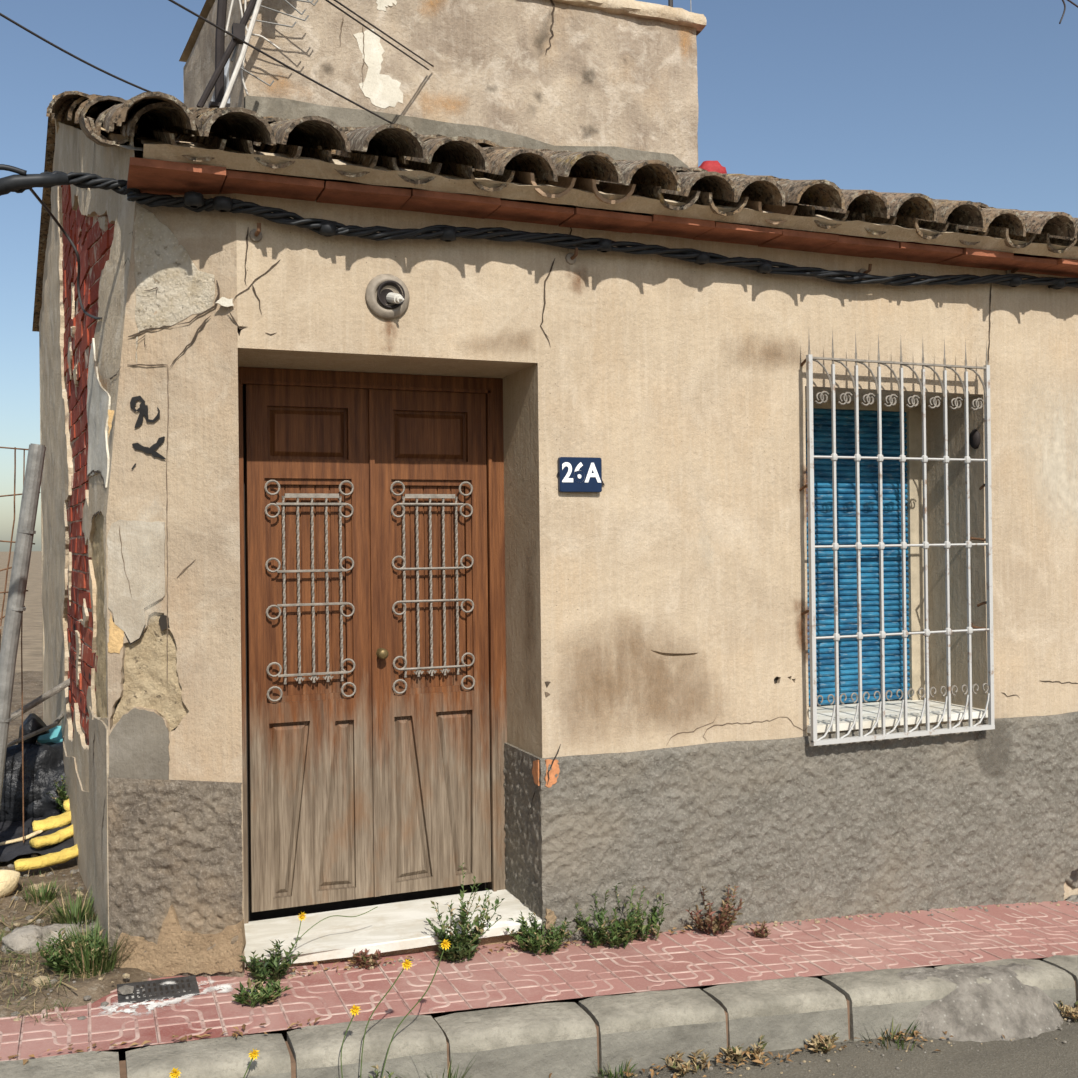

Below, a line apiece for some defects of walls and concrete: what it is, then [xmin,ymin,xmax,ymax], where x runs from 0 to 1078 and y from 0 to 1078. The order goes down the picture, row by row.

flaking render [353,29,403,109]
flaking render [376,0,397,11]
crack [545,0,555,55]
crack [540,259,555,347]
flaking render [61,185,189,745]
crack [110,227,280,678]
crack [666,716,810,746]
spalling [527,744,561,834]